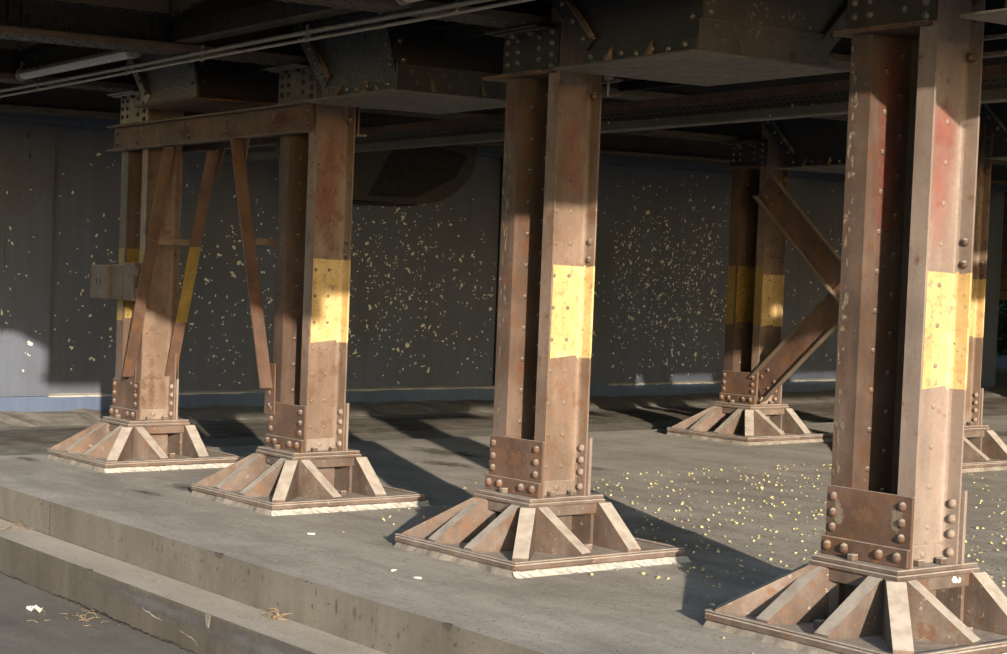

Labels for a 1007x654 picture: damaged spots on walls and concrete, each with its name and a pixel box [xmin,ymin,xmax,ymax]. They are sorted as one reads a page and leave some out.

peeling [200,220,247,285]
peeling [348,148,510,384]
peeling [594,175,728,379]